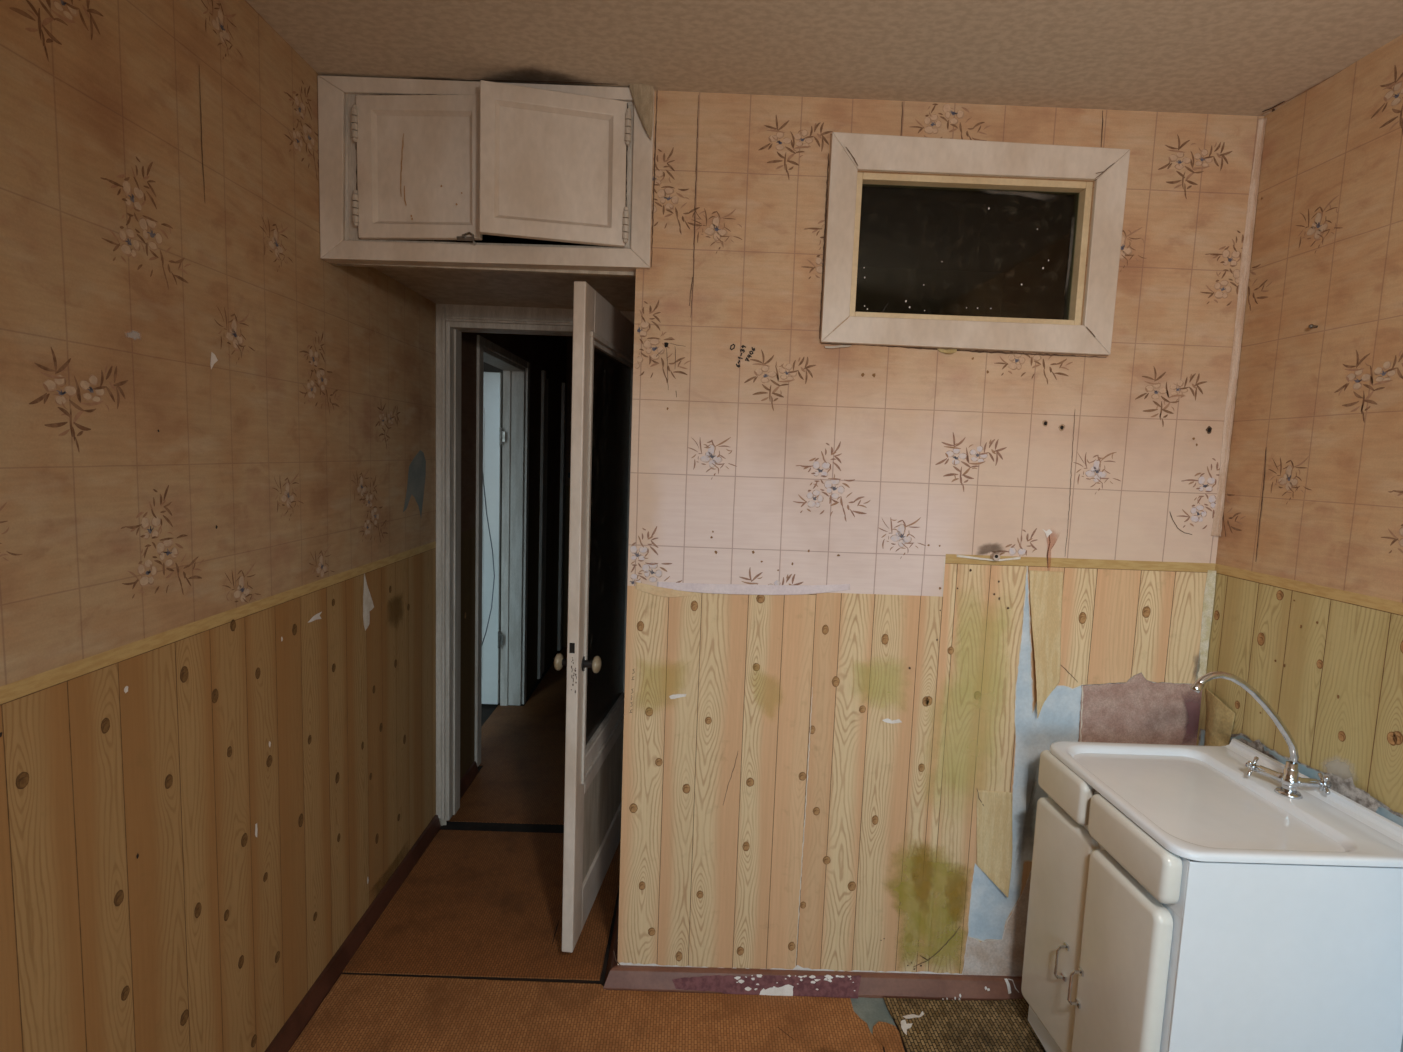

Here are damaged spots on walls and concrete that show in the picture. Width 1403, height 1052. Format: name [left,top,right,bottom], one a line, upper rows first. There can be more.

flaking render [618,566,1083,1035]
flaking render [1229,733,1403,827]
damp [893,855,964,970]